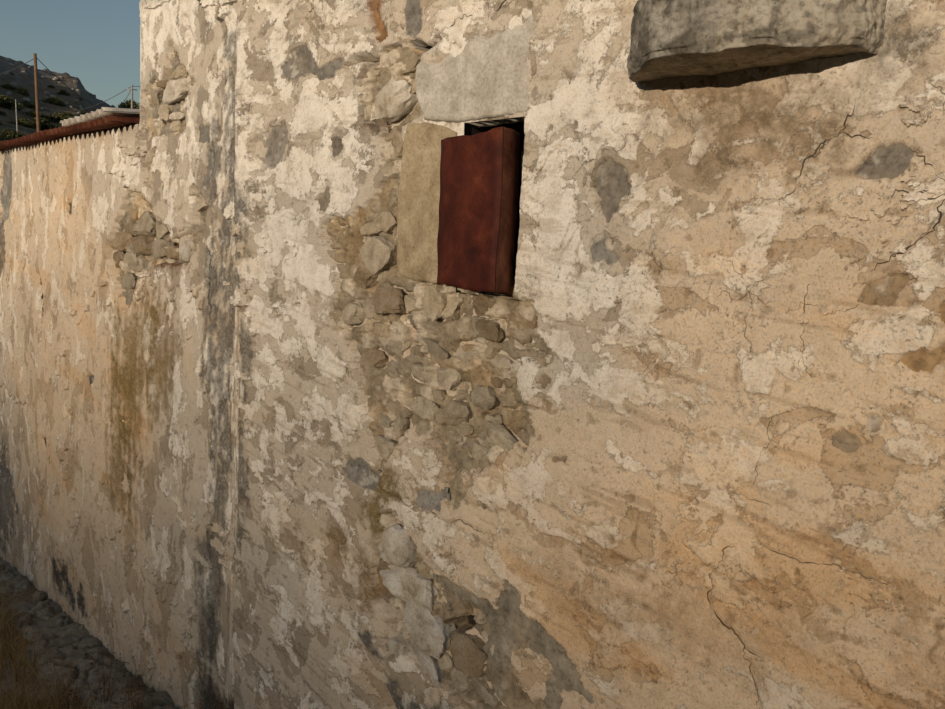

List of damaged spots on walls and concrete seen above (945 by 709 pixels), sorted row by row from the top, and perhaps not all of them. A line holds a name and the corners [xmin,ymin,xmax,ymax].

flaking render [68,46,258,340]
flaking render [264,121,288,169]
flaking render [318,0,554,512]
crack [779,88,872,206]
crack [870,148,945,272]
damp [105,307,172,513]
flaking render [901,346,945,373]
flaking render [377,513,594,709]
crack [690,529,896,705]